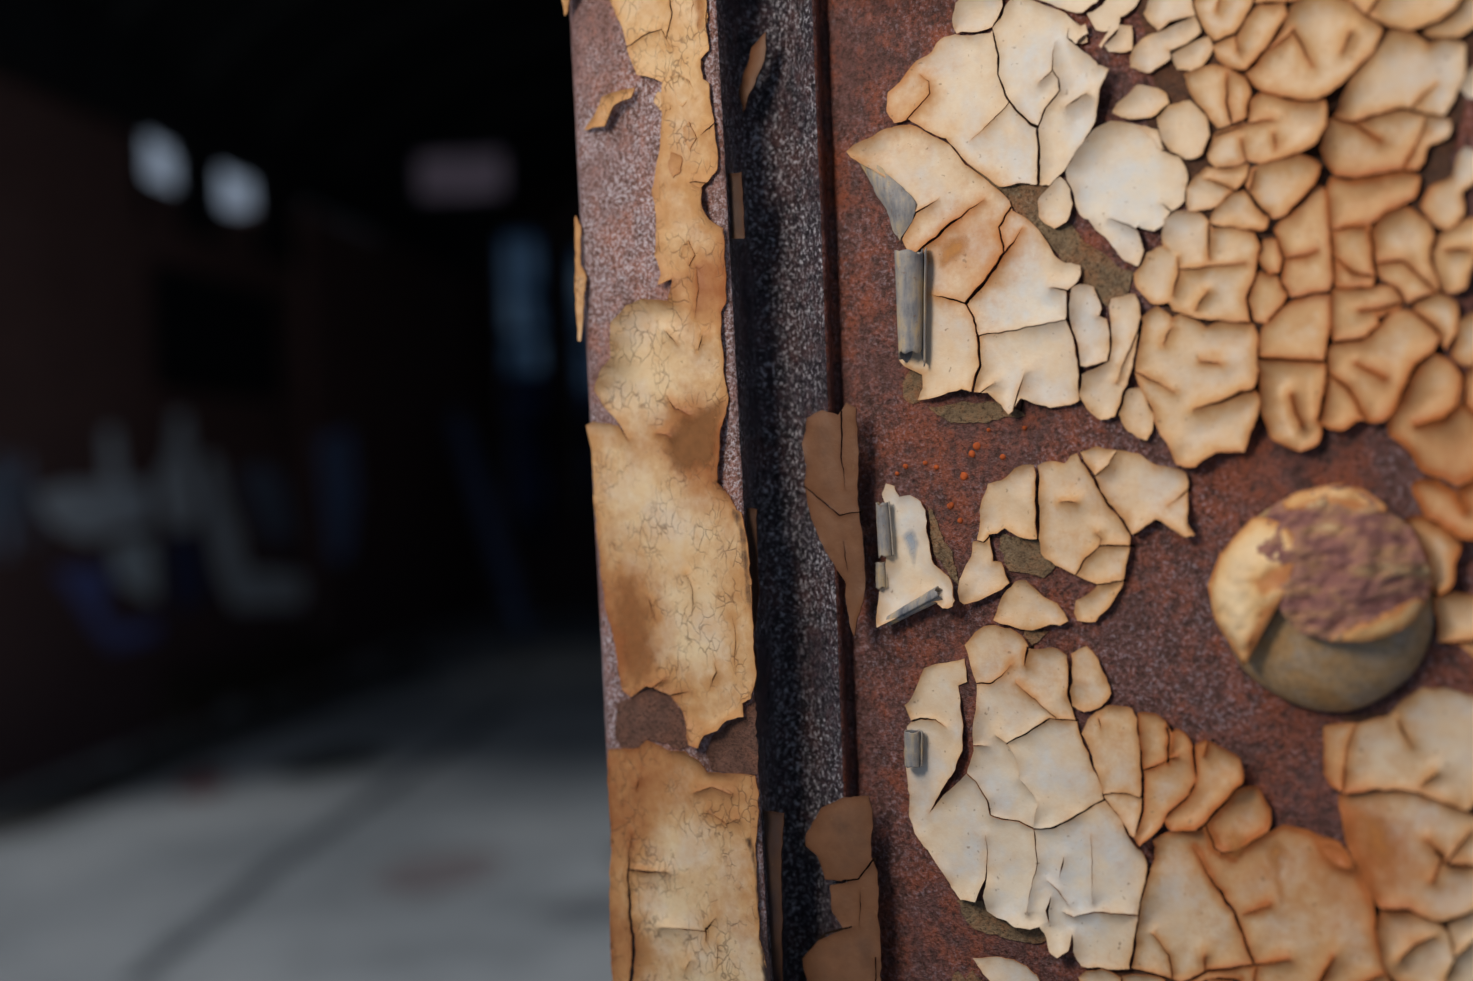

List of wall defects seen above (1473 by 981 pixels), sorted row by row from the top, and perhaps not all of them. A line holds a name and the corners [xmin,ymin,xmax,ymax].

crack [994,35,1039,129]
peeling [574,215,587,341]
crack [917,207,1071,337]
crack [1136,321,1162,385]
peeling [584,0,785,981]
corrosion [960,428,991,481]
crack [1063,449,1138,585]
corrosion [1257,485,1432,641]
crack [1009,718,1100,742]
crack [1002,726,1176,837]
crack [844,858,876,882]
crack [1218,888,1262,958]